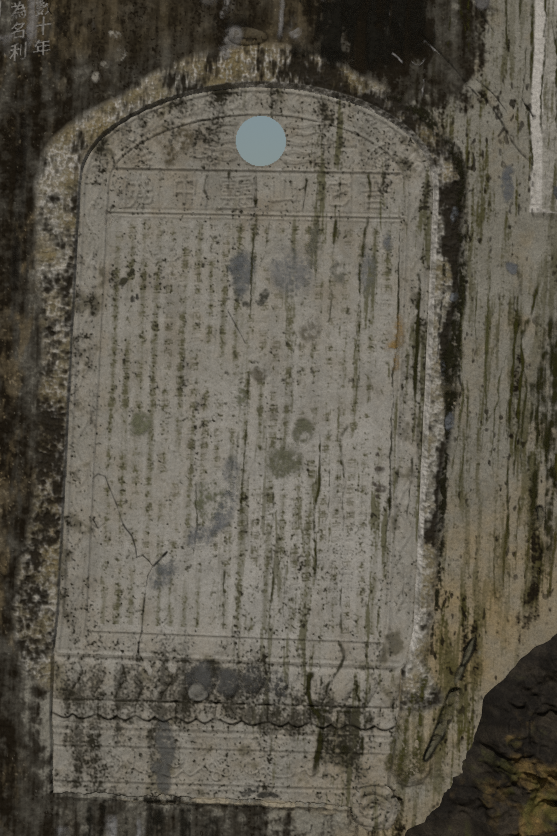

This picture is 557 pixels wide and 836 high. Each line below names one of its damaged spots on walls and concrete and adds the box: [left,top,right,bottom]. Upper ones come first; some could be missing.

water stain [292,0,435,66]
water stain [525,4,545,129]
water stain [413,275,421,394]
water stain [441,233,468,440]
water stain [507,287,557,594]
water stain [435,452,464,611]
water stain [493,494,520,592]
water stain [86,805,116,836]
water stain [134,798,190,836]